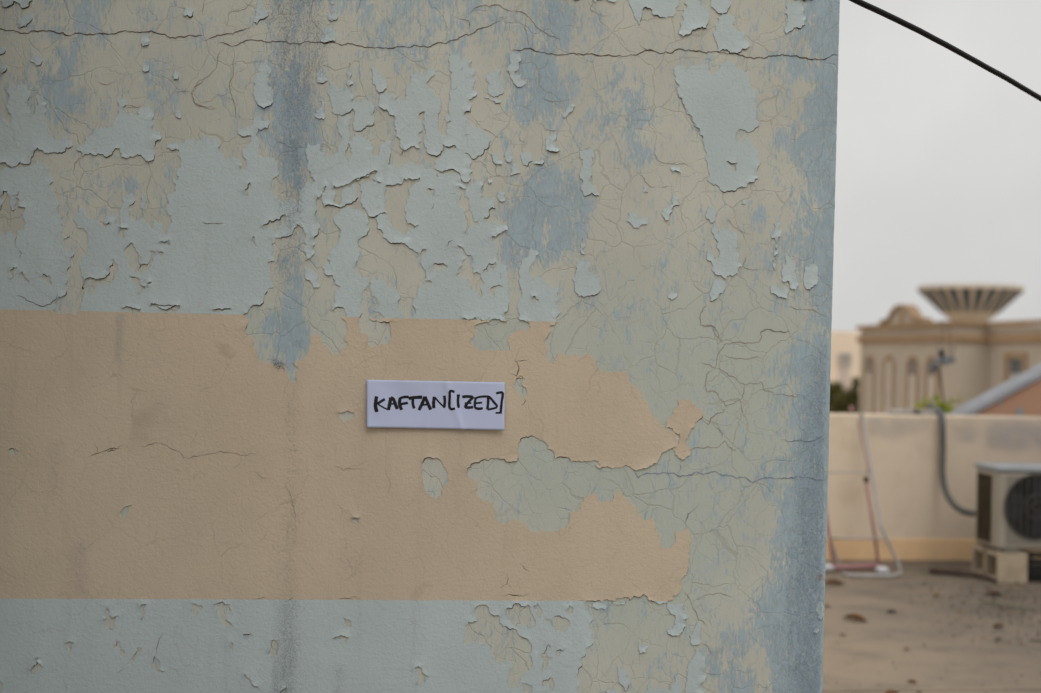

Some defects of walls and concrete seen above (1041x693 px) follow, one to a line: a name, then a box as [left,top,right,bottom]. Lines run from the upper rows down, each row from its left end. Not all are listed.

peeling [0,47,162,167]
crack [0,0,836,119]
peeling [315,52,560,233]
peeling [629,0,760,193]
peeling [82,222,169,294]
peeling [244,232,391,382]
peeling [433,246,503,298]
peeling [707,225,742,301]
peeling [770,222,818,299]
crack [634,306,823,483]
peeling [464,603,573,693]
peeling [586,594,707,693]